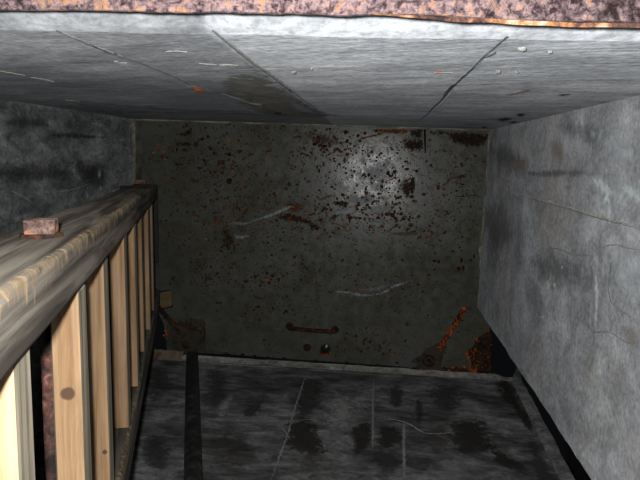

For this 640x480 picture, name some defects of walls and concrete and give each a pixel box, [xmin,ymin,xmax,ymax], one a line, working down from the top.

crack [423,36,508,118]
rust [357,129,424,154]
rust [430,126,488,148]
rust [365,160,418,198]
rust [279,203,323,230]
rust [330,194,371,232]